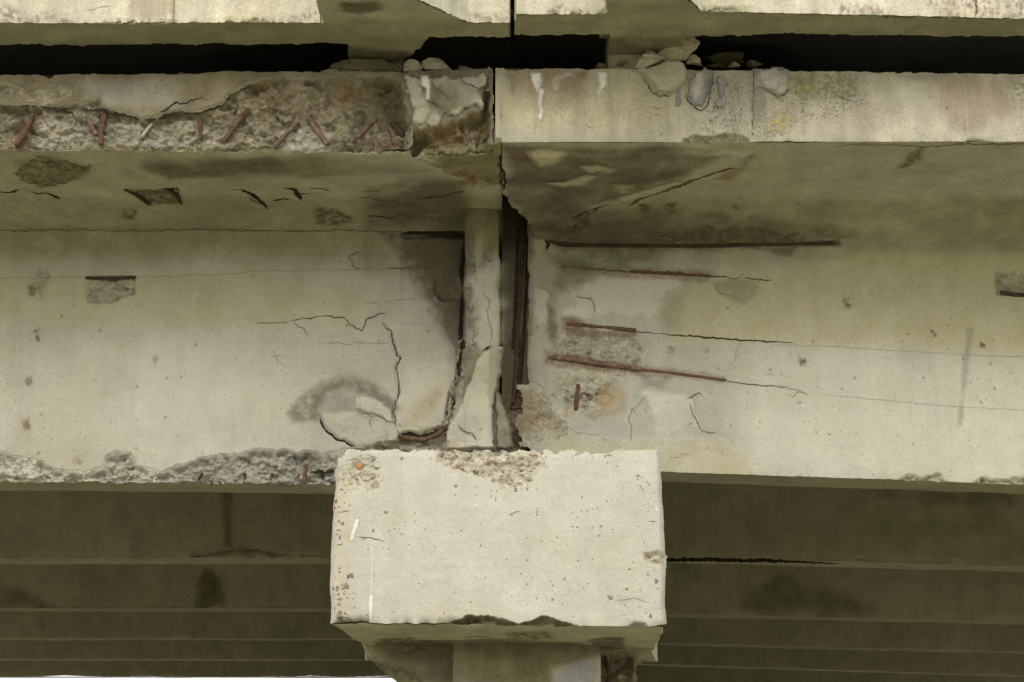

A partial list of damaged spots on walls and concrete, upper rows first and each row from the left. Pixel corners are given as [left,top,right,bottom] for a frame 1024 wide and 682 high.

leakage [528,70,572,119]
leakage [597,71,607,93]
spalling [0,58,502,188]
spalling [124,187,183,206]
crack [577,168,735,217]
crack [0,187,493,433]
crack [320,418,354,447]
spalling [0,222,838,623]
crack [686,392,713,433]
crack [666,556,838,564]